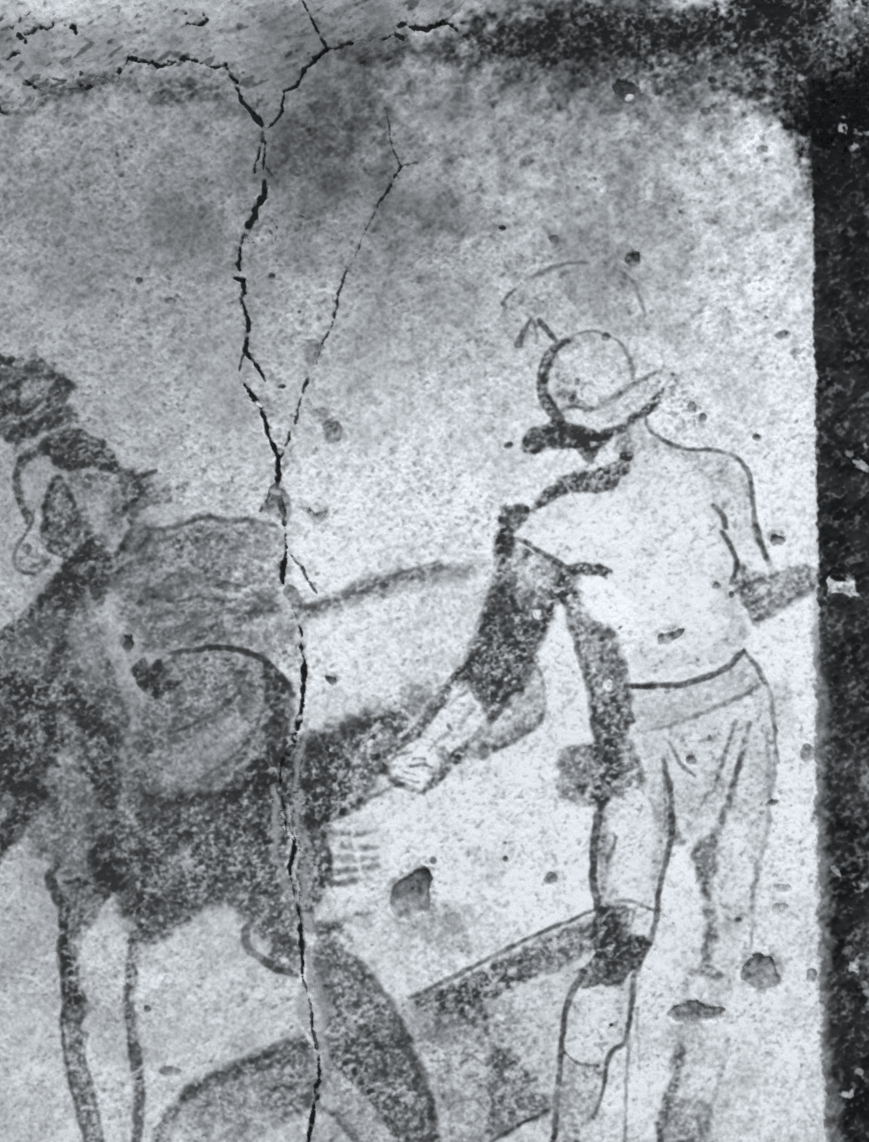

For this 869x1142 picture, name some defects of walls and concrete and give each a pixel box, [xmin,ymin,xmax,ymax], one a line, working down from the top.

crack [7,14,93,90]
crack [382,19,458,41]
crack [117,1,402,1142]
spalling [391,857,436,906]